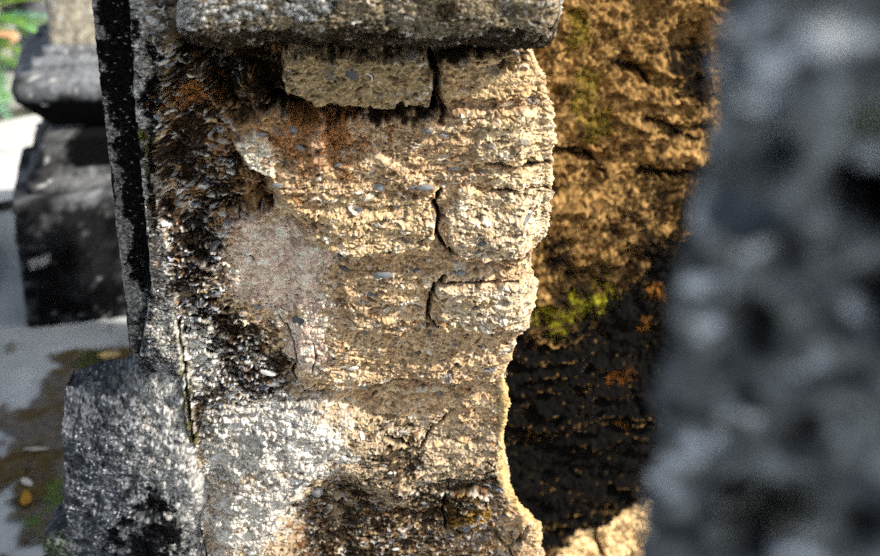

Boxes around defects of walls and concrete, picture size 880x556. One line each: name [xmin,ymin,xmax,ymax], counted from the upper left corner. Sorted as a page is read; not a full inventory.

crack [427,47,447,118]
crack [432,187,452,250]
water stain [0,0,561,556]
crack [426,274,482,327]